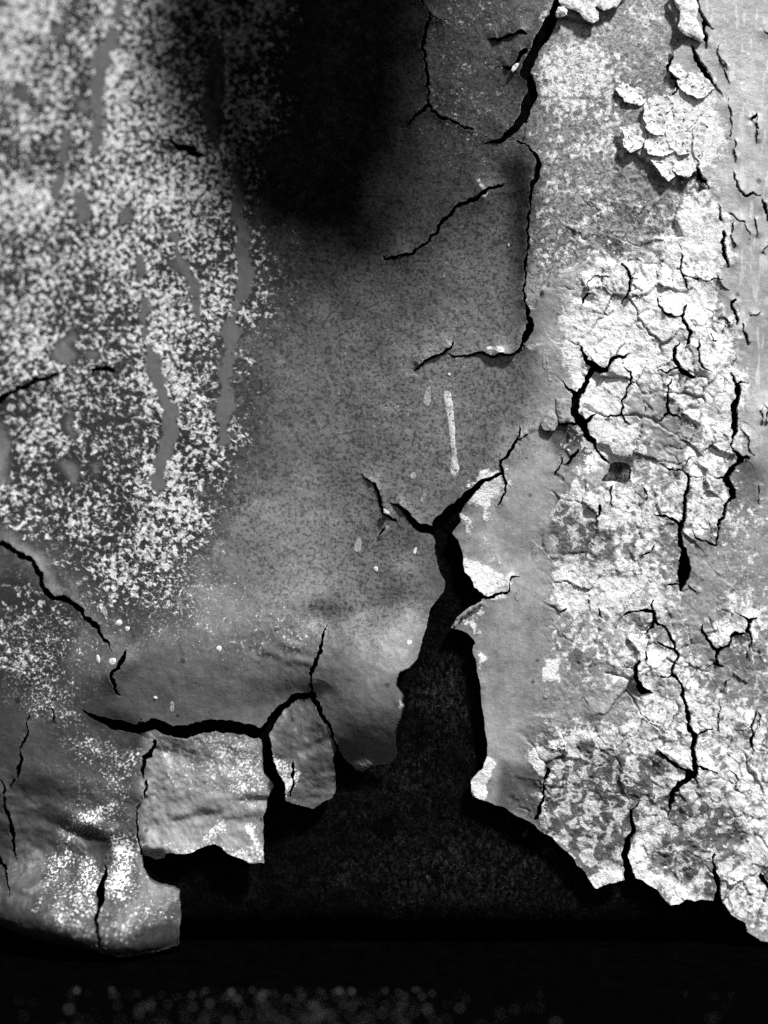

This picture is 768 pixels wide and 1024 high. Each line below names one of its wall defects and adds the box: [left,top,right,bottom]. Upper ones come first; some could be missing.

damp [50,125,92,226]
damp [89,0,125,156]
damp [135,254,182,495]
damp [168,225,203,323]
crack [358,427,528,538]
crack [407,0,560,371]
crack [554,341,633,525]
peeling [522,0,714,308]
crack [598,0,768,814]
crack [84,624,339,852]
peeling [137,518,734,920]
crack [621,803,638,877]